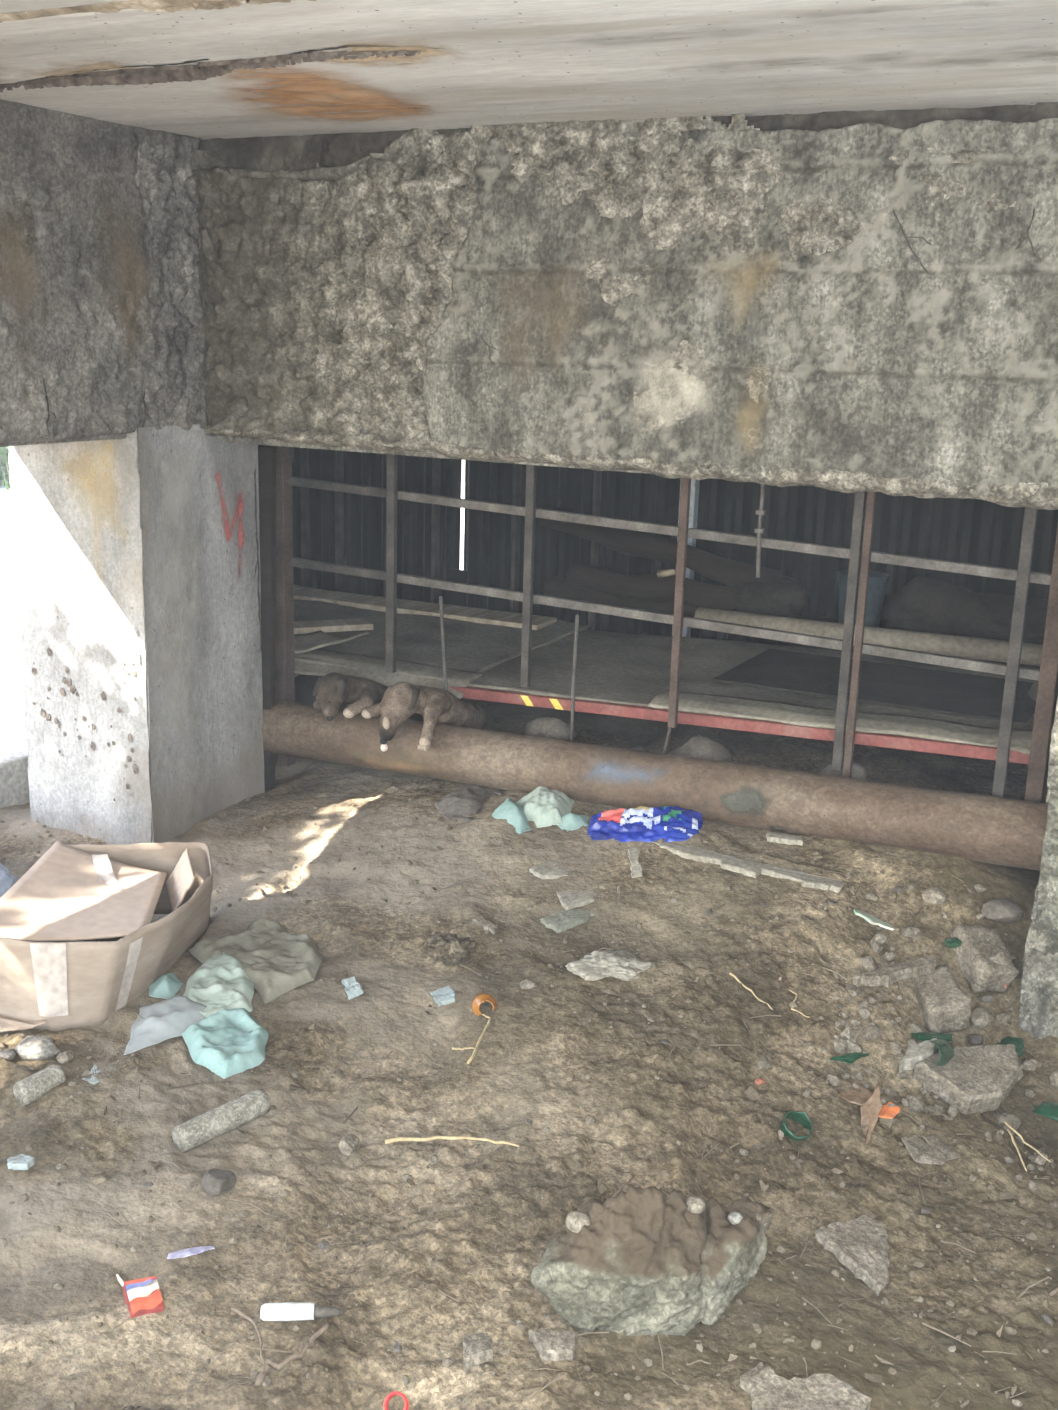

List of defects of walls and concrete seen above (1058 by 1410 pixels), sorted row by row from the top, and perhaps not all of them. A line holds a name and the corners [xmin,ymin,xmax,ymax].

corrosion [238,46,445,121]
spalling [135,113,1058,510]
spalling [1046,700,1058,803]